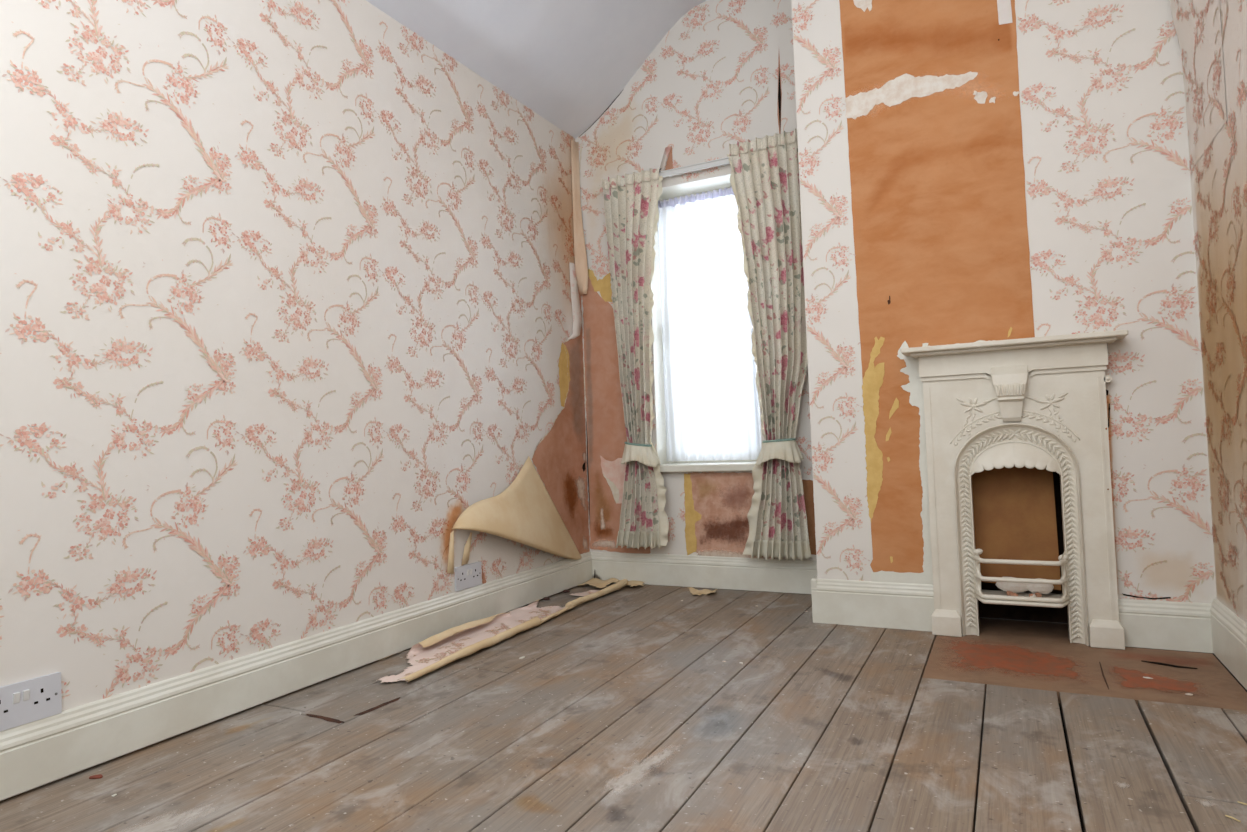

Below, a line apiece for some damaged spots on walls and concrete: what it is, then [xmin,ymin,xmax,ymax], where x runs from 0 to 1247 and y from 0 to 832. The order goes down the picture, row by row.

flaking render [447,140,651,574]
flaking render [688,472,771,559]
flaking render [839,0,1035,573]